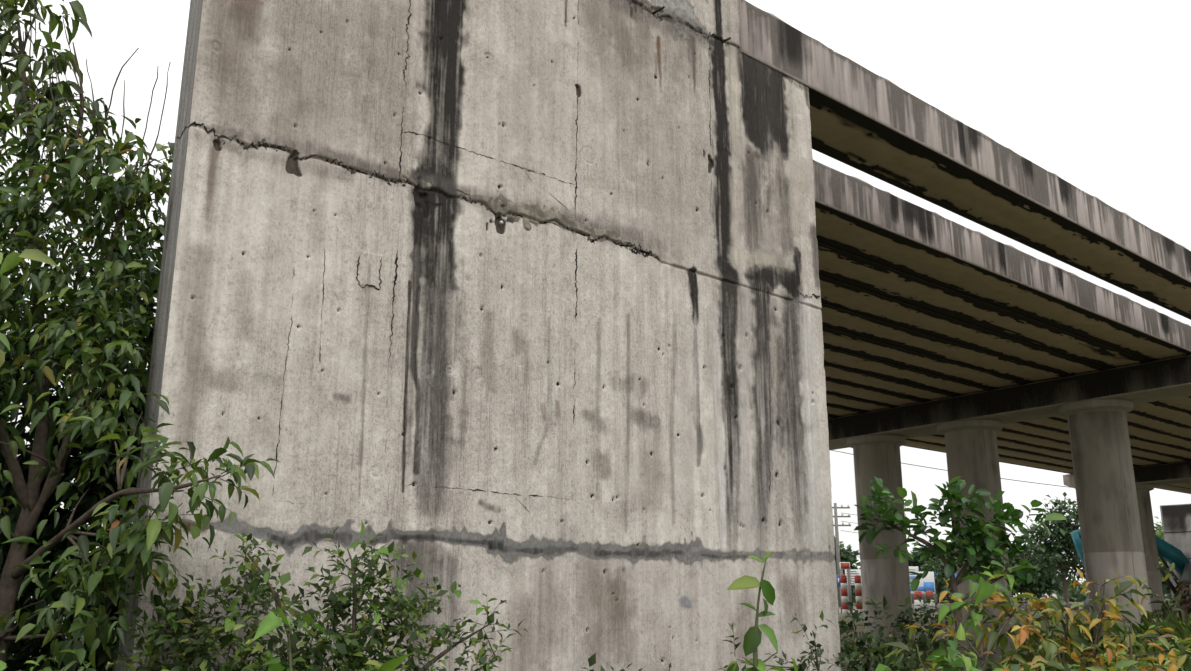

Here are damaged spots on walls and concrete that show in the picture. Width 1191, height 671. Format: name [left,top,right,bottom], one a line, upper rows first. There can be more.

damp [329,0,471,492]
crack [175,0,659,318]
peeling [645,0,711,50]
damp [687,266,699,346]
crack [799,291,820,299]
damp [689,0,1191,556]